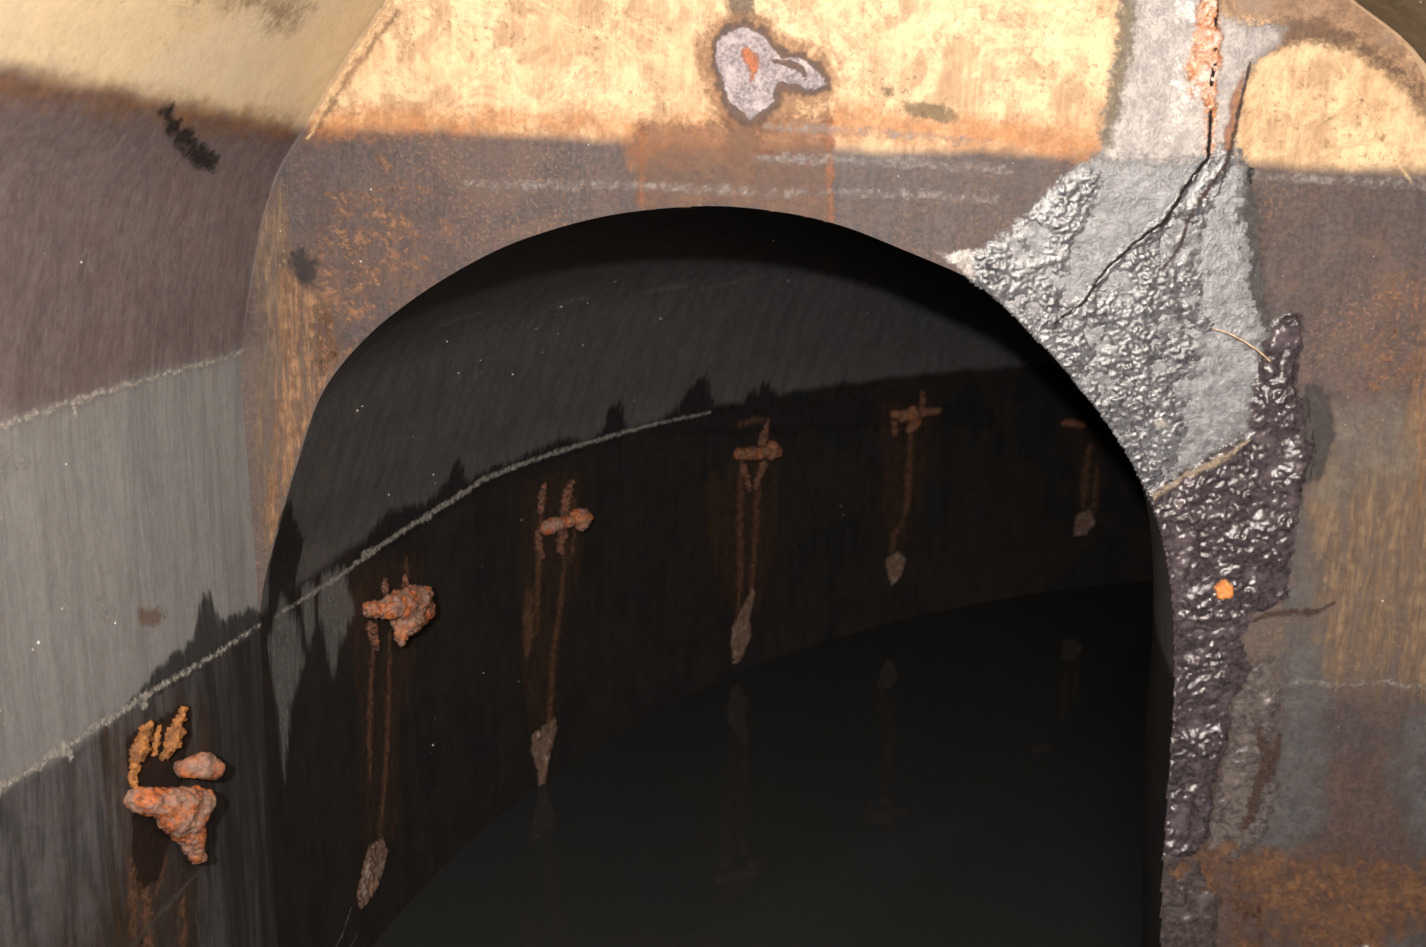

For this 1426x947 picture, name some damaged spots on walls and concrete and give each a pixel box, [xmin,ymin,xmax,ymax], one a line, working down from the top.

peeling [696,14,837,140]
crack [1053,0,1251,325]
rust [1183,0,1426,157]
rust [126,812,170,947]
rust [126,705,192,789]
rust [337,620,392,945]
rust [380,558,410,598]
rust [522,478,577,786]
rust [731,415,771,664]
spalling [968,141,1312,947]